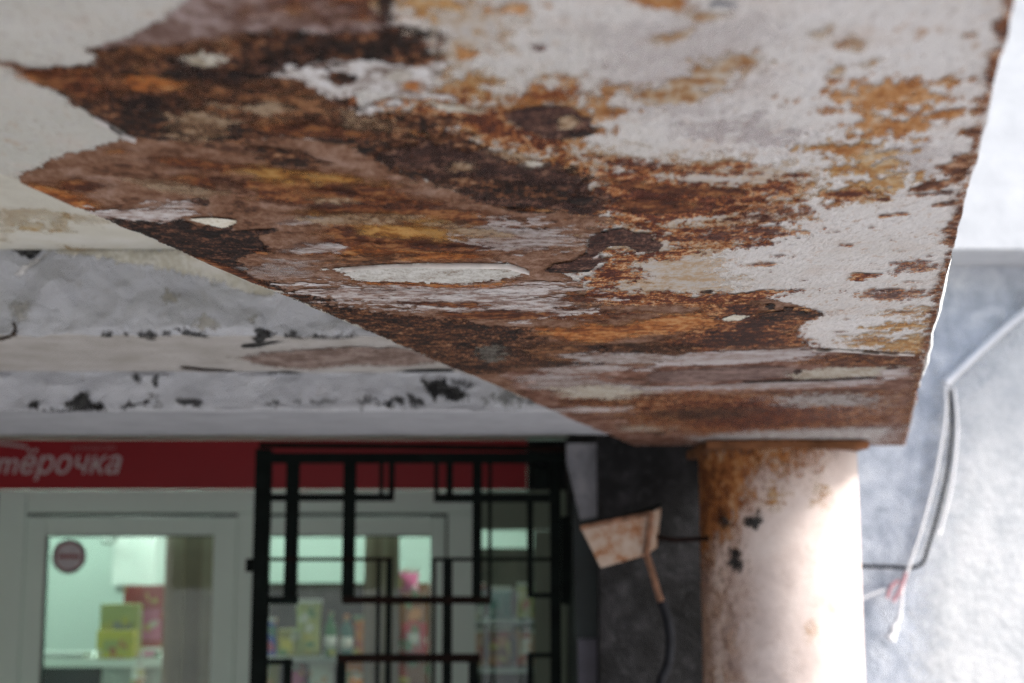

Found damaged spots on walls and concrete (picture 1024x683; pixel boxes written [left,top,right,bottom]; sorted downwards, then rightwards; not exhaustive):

peeling [13,136,923,446]
corrosion [0,0,1015,446]
corrosion [699,449,833,577]